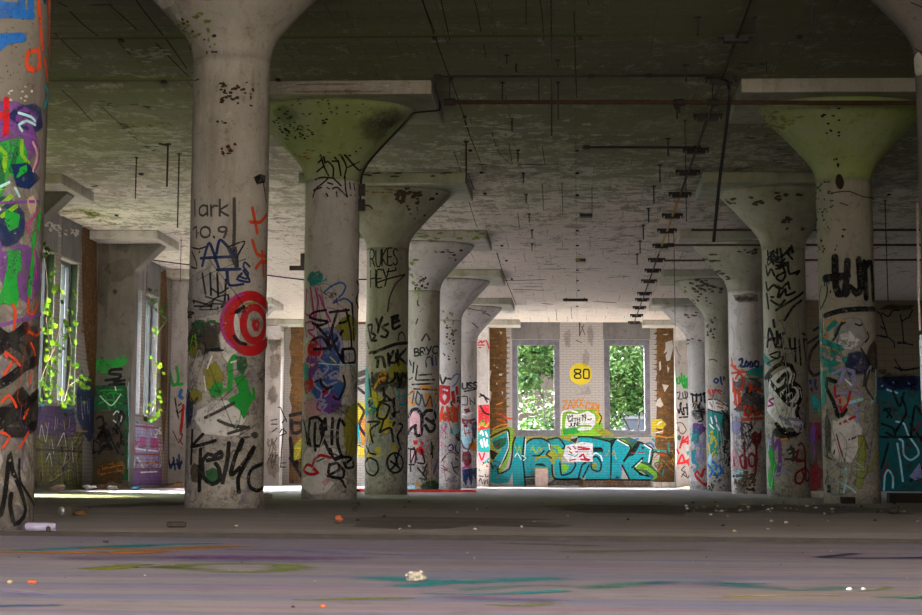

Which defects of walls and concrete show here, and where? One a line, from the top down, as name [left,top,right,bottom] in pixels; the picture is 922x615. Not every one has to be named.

peeling [914,52,922,76]
flaking render [490,328,510,435]
flaking render [652,328,674,482]